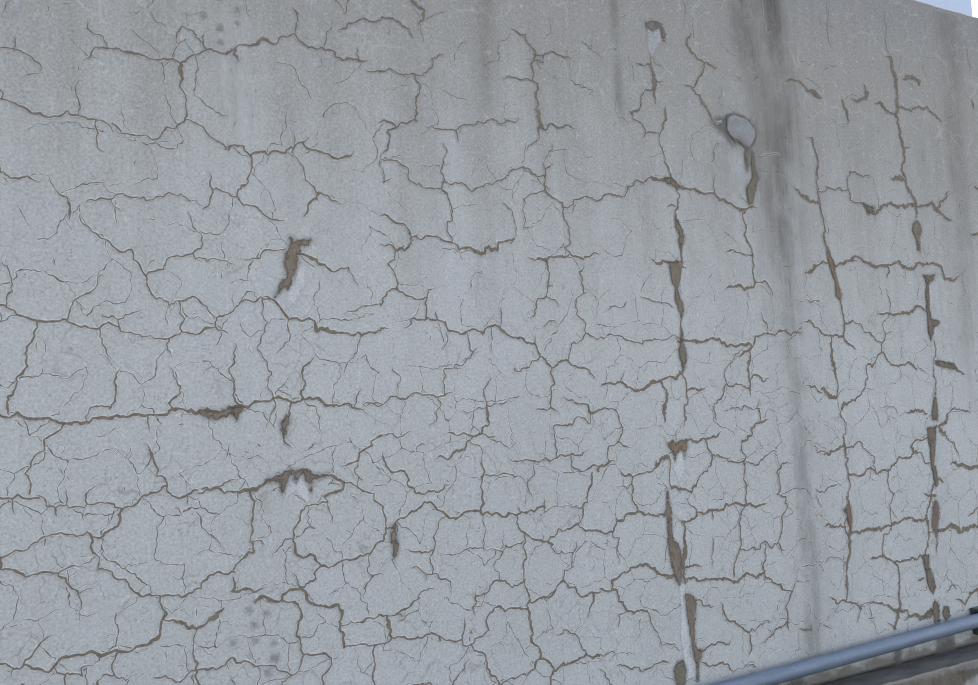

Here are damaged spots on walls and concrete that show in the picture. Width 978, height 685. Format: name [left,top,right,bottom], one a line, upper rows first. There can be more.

crack [335,0,445,42]
crack [276,61,367,130]
crack [746,78,823,179]
crack [821,84,869,147]
spalling [274,237,311,298]
crack [296,244,359,287]
crack [606,295,628,313]
spalling [923,274,940,340]
spalling [928,392,939,487]
spalling [265,468,328,493]
spalling [664,491,703,685]
spalling [922,553,950,624]